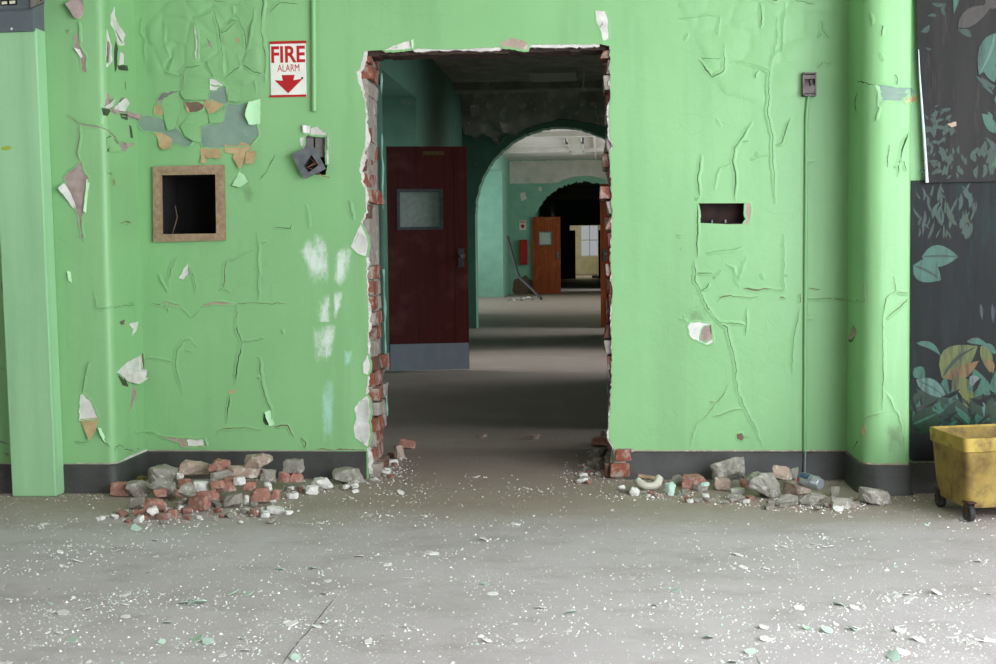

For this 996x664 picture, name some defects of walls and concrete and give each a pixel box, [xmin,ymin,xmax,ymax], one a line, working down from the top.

peeling [104,5,128,73]
crack [136,0,299,94]
peeling [58,160,91,242]
peeling [100,77,261,187]
peeling [462,91,607,146]
crack [675,0,831,449]
crack [884,132,910,178]
peeling [115,352,150,414]
crack [91,204,313,449]
damp [297,231,353,450]
spalling [352,394,373,448]
crack [832,276,908,452]